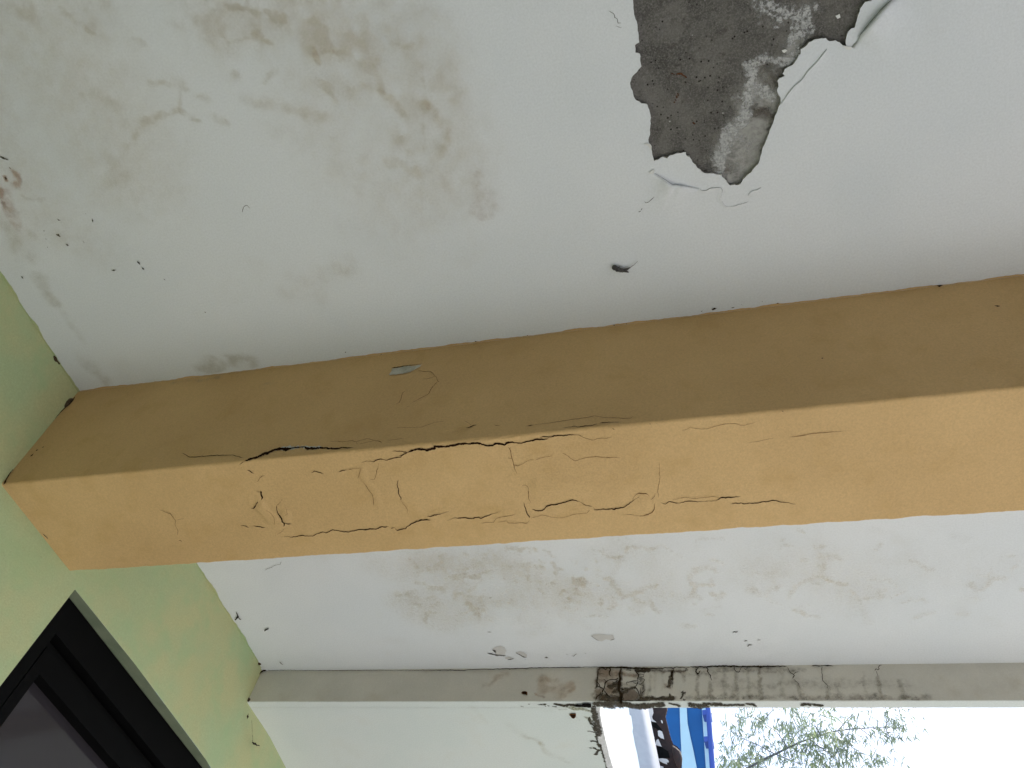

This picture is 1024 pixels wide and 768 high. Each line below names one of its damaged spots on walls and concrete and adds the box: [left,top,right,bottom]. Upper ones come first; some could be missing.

spalling [630,0,939,220]
crack [183,416,788,537]
peeling [488,646,527,660]
crack [270,657,831,704]